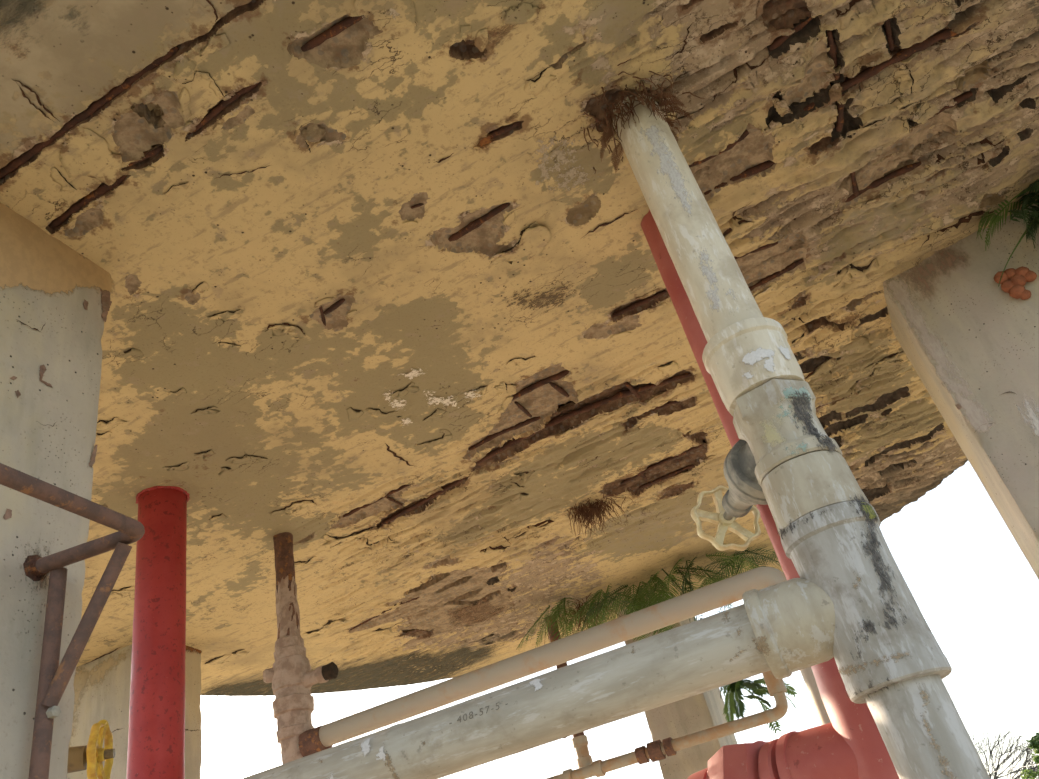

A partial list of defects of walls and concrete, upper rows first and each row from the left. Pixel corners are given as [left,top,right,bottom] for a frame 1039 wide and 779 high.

spalling [443,25,495,66]
crack [11,78,59,122]
spalling [0,0,278,241]
rust [473,135,494,148]
spalling [687,0,985,202]
spalling [826,58,1039,213]
spalling [733,219,810,301]
spalling [305,291,360,334]
peeling [793,288,890,375]
spalling [293,362,715,545]
spalling [815,384,912,448]
spalling [849,422,946,502]